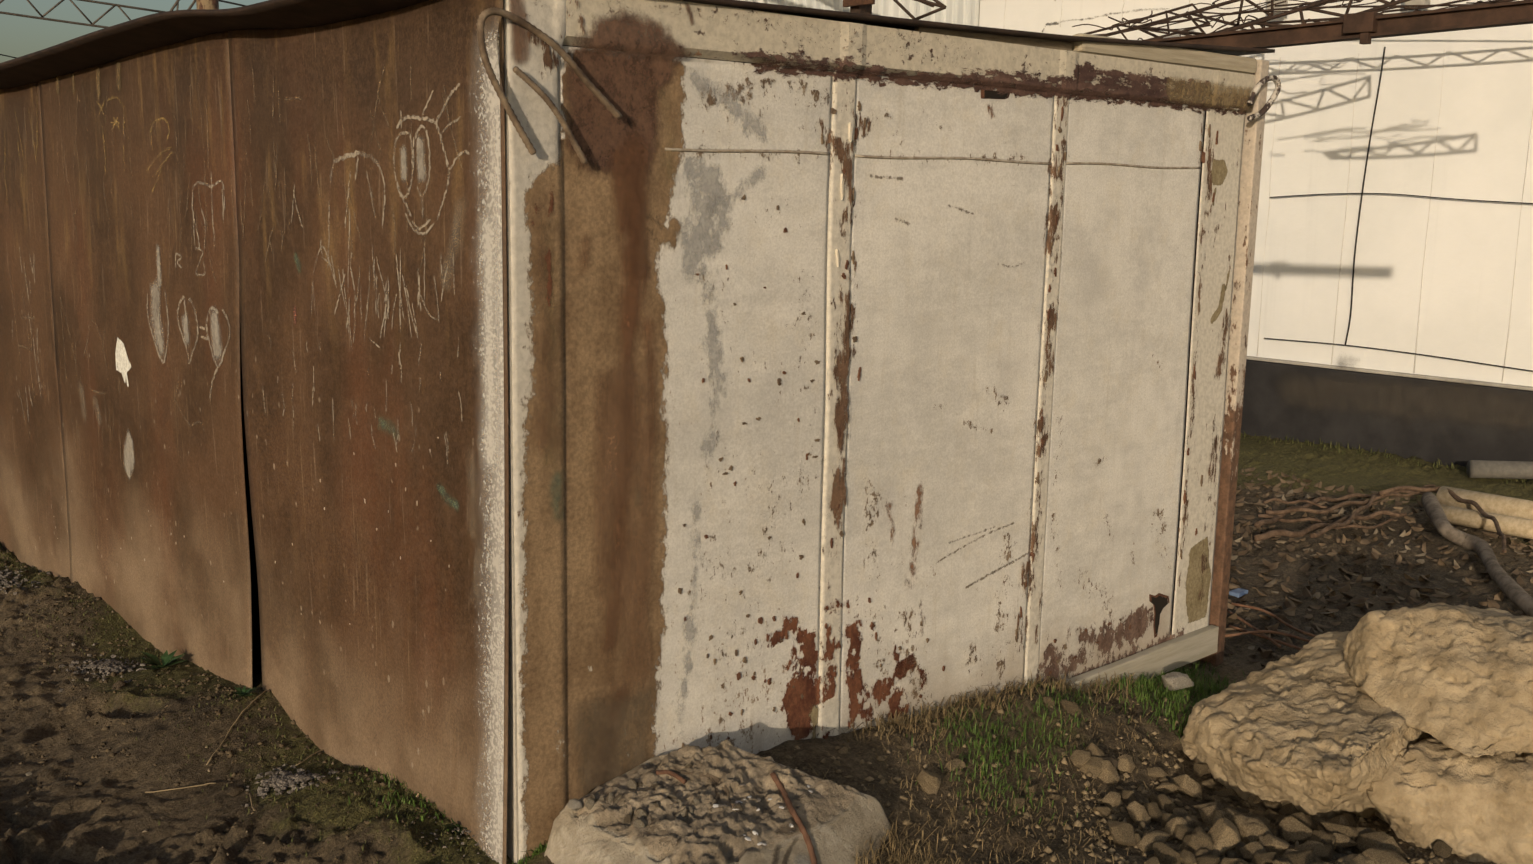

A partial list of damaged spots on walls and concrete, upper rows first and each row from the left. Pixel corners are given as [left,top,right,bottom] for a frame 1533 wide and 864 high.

rust [509,0,1254,796]